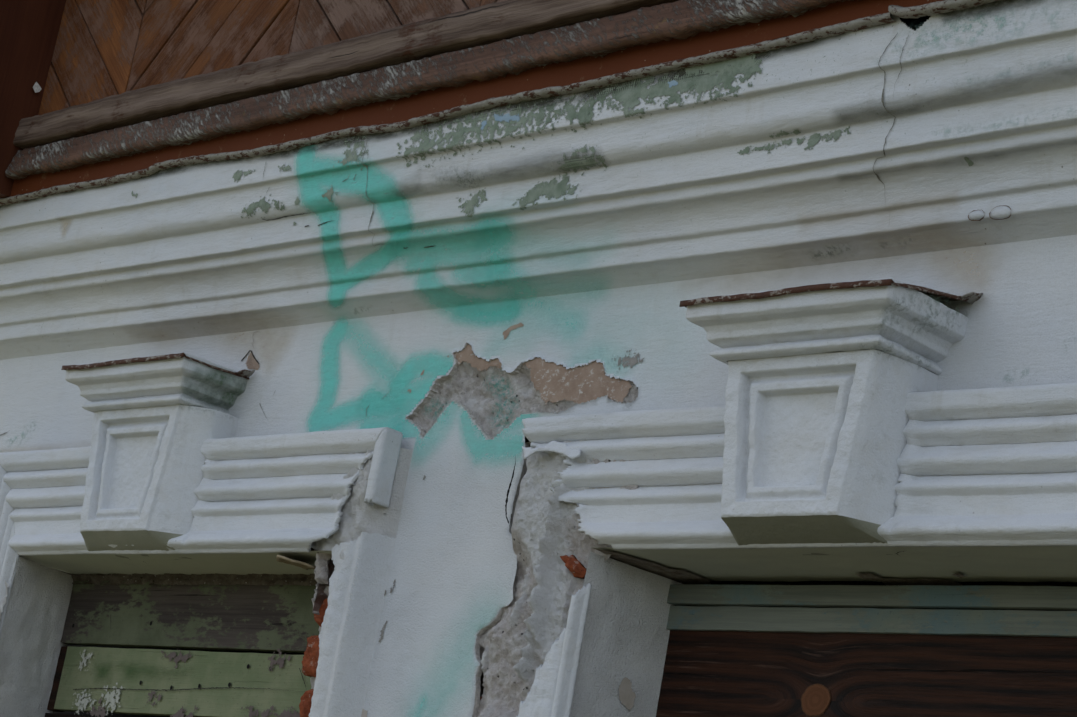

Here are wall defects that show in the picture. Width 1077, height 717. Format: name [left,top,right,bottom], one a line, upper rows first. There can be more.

peeling [241,195,300,218]
peeling [458,188,487,218]
peeling [512,144,611,210]
peeling [393,54,763,171]
peeling [737,126,851,155]
crack [873,33,909,227]
spalling [411,344,638,438]
spalling [276,448,413,717]
spalling [476,440,711,717]